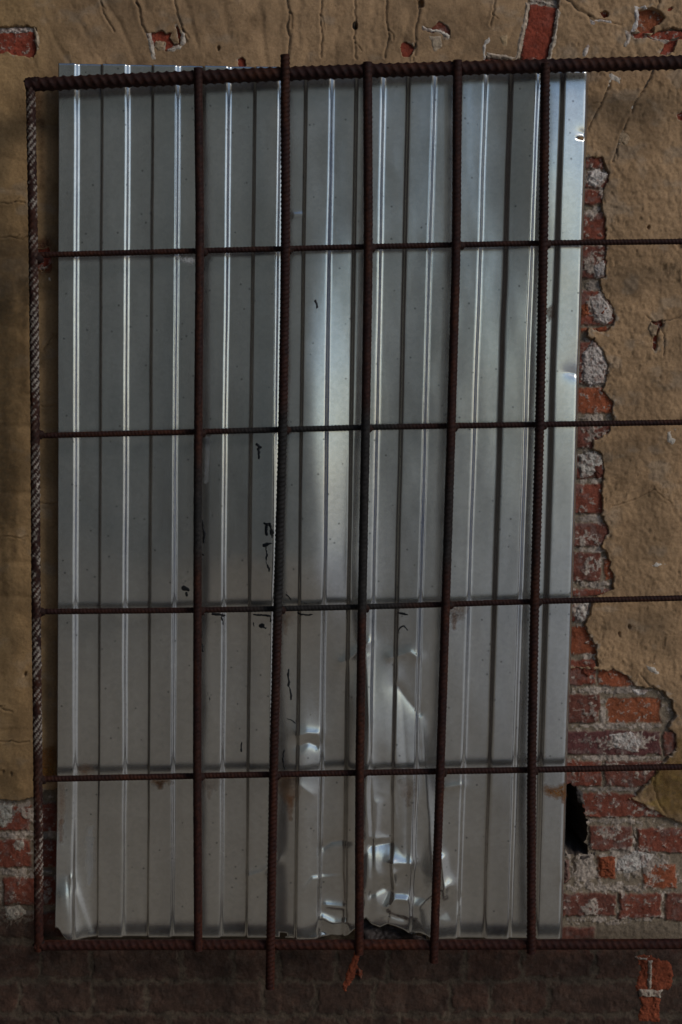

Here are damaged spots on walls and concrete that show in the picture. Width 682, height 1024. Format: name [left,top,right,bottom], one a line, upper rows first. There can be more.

spalling [0,26,40,58]
spalling [146,27,186,60]
crack [353,0,420,53]
spalling [483,0,561,61]
spalling [623,5,682,56]
spalling [562,157,682,936]
spalling [0,788,62,936]
spalling [635,954,674,1022]